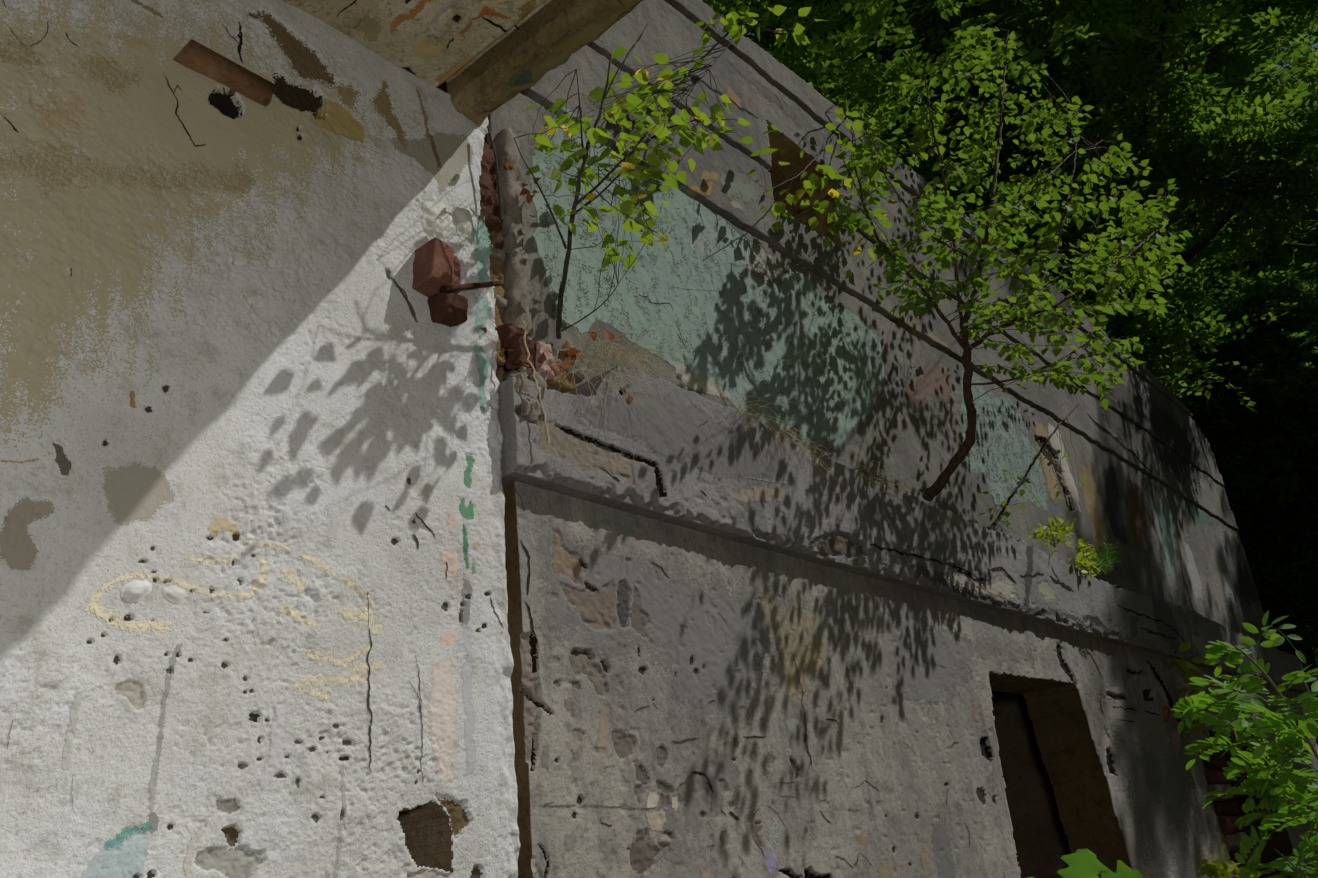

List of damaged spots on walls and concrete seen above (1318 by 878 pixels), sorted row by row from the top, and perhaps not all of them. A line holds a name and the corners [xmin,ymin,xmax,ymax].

crack [163,75,206,147]
peeling [247,10,366,142]
crack [555,426,667,498]
crack [579,559,598,592]
crack [489,489,552,771]
crack [672,660,879,878]
spalling [194,798,263,878]
crack [538,843,549,878]
crack [542,802,657,826]